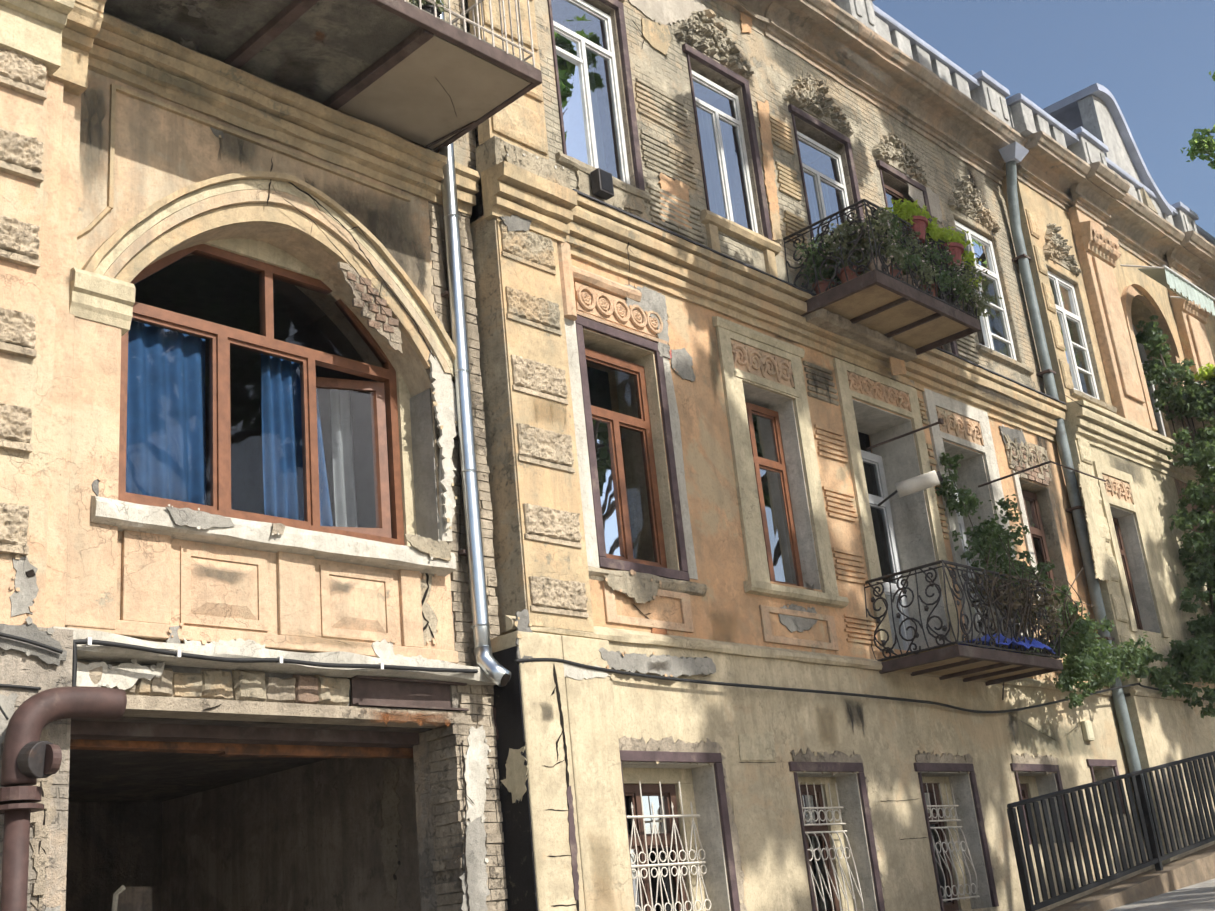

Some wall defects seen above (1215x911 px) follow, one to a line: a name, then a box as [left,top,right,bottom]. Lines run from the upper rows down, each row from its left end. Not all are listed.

water stain [80,101,104,170]
crack [267,158,435,359]
flaking render [337,262,403,354]
flaking render [625,284,675,370]
flaking render [371,350,458,660]
flaking render [9,554,39,625]
crack [421,573,435,639]
flaking render [602,569,662,604]
flaking render [76,659,350,706]
crack [544,665,569,811]
peeling [458,707,529,911]